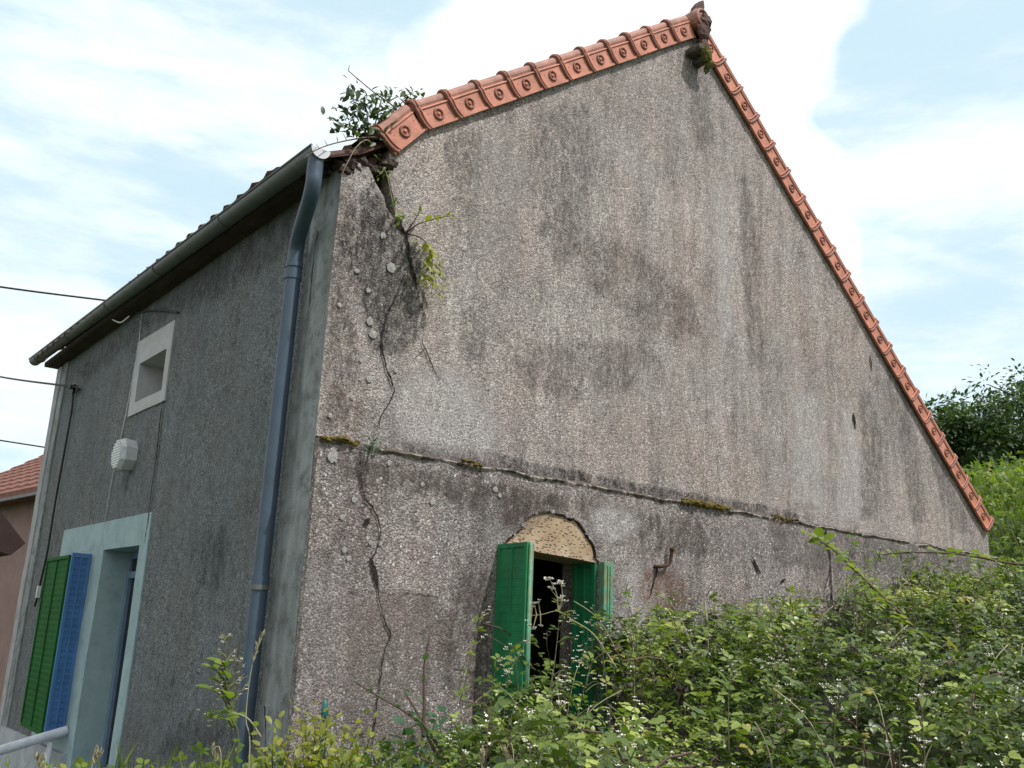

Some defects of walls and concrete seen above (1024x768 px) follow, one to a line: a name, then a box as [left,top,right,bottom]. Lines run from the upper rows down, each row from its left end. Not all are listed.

leakage [328,195,425,429]
crack [375,217,417,426]
crack [361,458,397,749]
leakage [339,462,566,530]
leakage [403,392,823,518]
leakage [625,510,708,554]